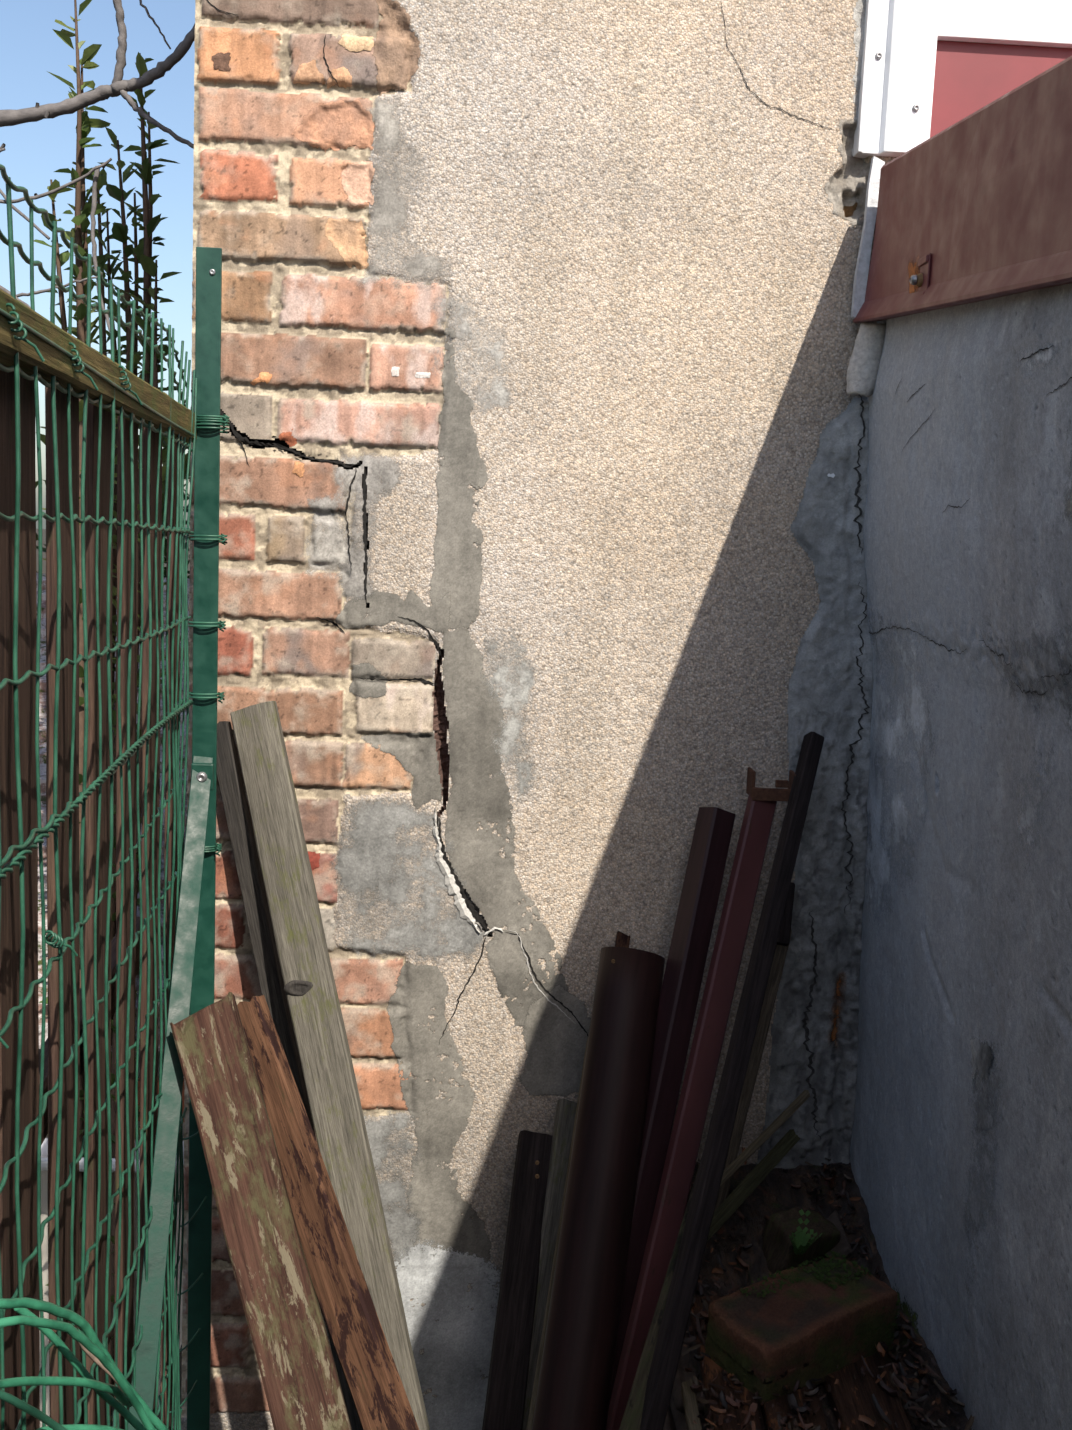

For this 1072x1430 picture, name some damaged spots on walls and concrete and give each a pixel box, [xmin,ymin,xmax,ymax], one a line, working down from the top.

spalling [212,52,231,71]
crack [721,3,838,131]
spalling [291,0,423,270]
spalling [824,119,871,226]
spalling [250,372,272,386]
peeling [846,322,886,398]
spalling [279,428,305,478]
crack [220,409,588,1044]
spalling [308,851,321,870]